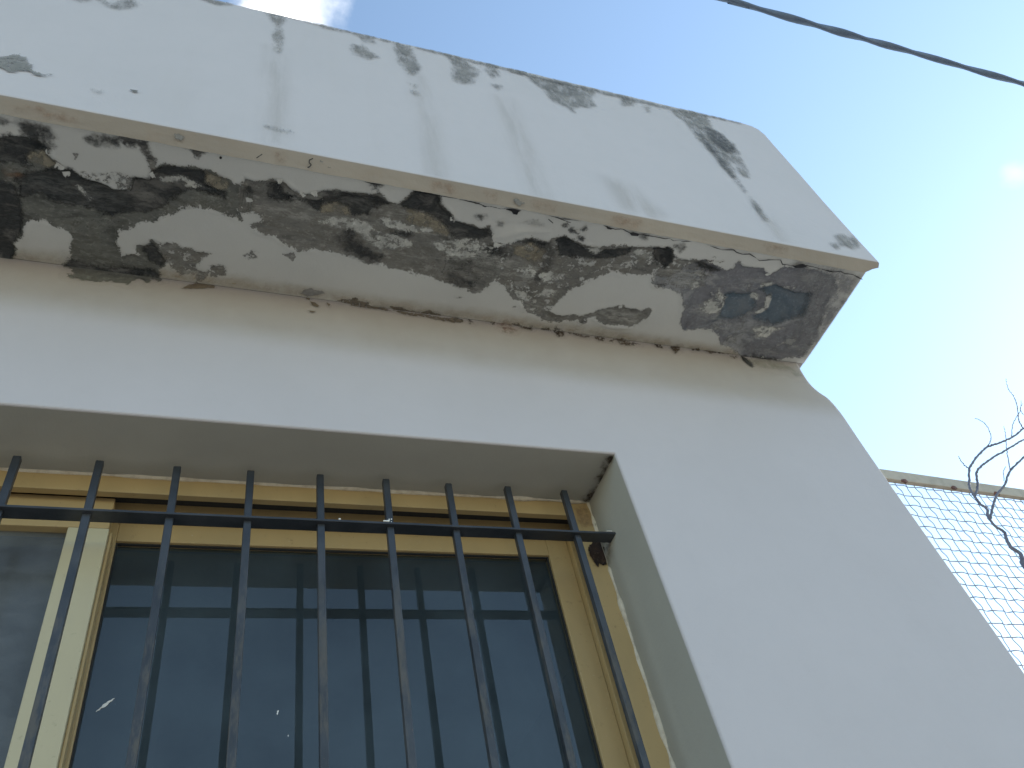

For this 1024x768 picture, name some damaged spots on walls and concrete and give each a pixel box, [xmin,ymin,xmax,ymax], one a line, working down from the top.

peeling [0,54,52,76]
damp [308,21,420,74]
damp [424,48,748,177]
crack [414,191,577,223]
flaking render [0,134,855,367]
crack [606,226,861,279]